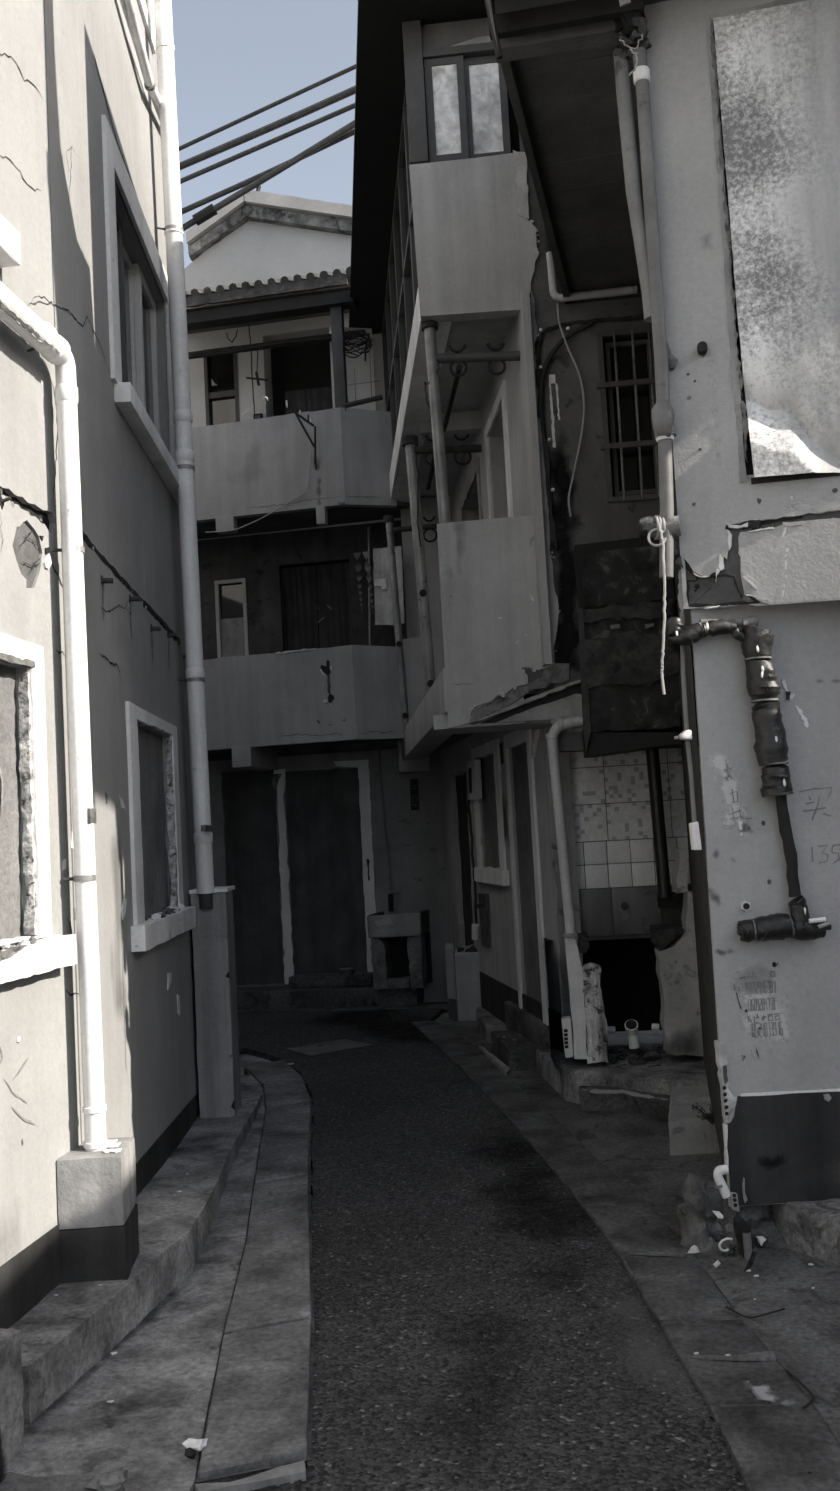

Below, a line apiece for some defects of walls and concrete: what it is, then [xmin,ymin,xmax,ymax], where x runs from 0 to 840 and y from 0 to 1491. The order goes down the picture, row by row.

crack [0,53,41,95]
spalling [674,511,840,624]